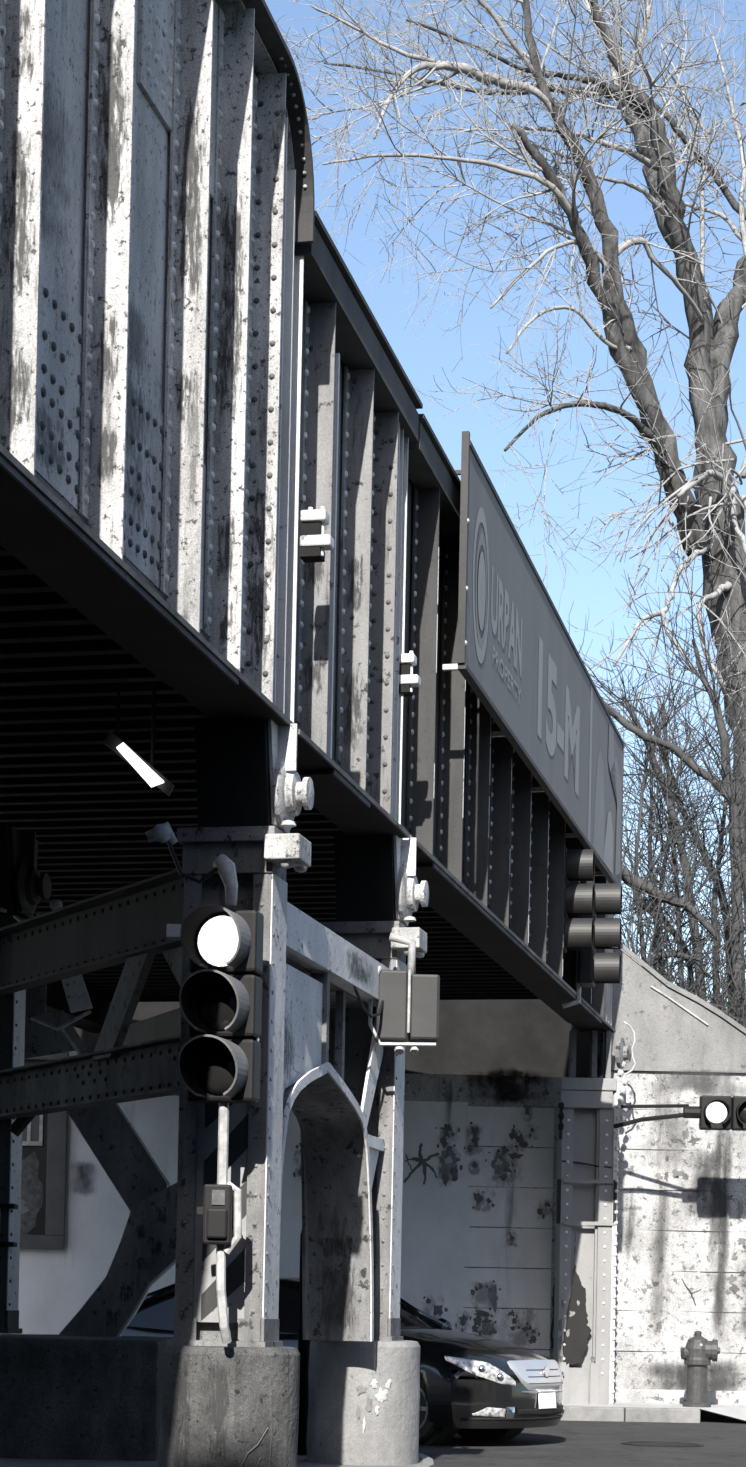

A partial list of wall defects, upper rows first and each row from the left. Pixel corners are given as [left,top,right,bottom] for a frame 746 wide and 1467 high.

corrosion [1,6,71,295]
corrosion [98,33,127,221]
corrosion [177,98,204,293]
corrosion [216,195,243,415]
corrosion [8,351,64,469]
corrosion [97,300,149,527]
corrosion [217,488,270,664]
corrosion [304,653,321,694]
corrosion [304,562,324,591]
corrosion [344,670,363,748]
corrosion [347,557,363,611]
water stain [696,1142,730,1323]